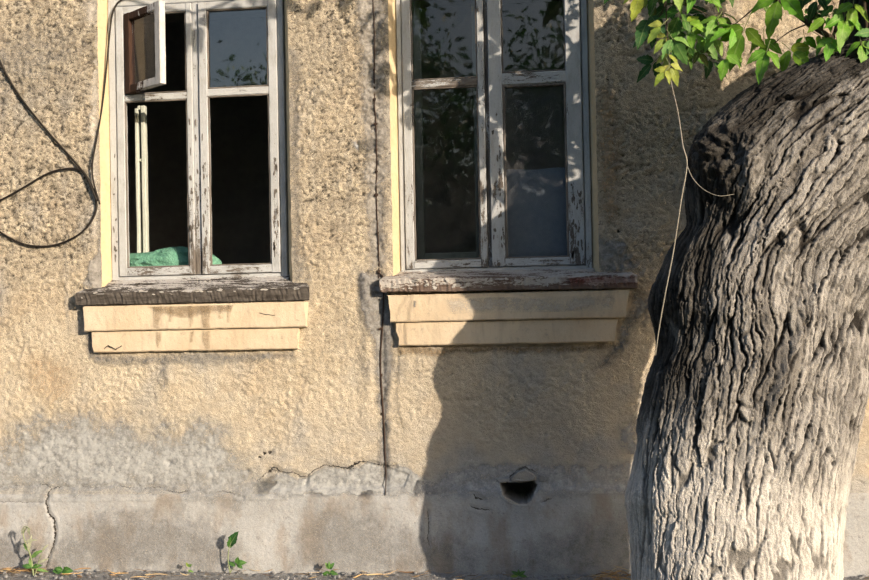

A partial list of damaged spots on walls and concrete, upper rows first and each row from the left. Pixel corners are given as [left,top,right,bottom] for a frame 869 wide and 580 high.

peeling [189,165,207,268]
peeling [391,277,522,289]
water stain [153,305,230,327]
water stain [88,336,274,386]
water stain [269,273,648,498]
water stain [0,412,260,508]
crack [259,460,394,480]
spalling [496,466,546,508]
crack [0,484,235,567]
water stain [56,512,234,572]